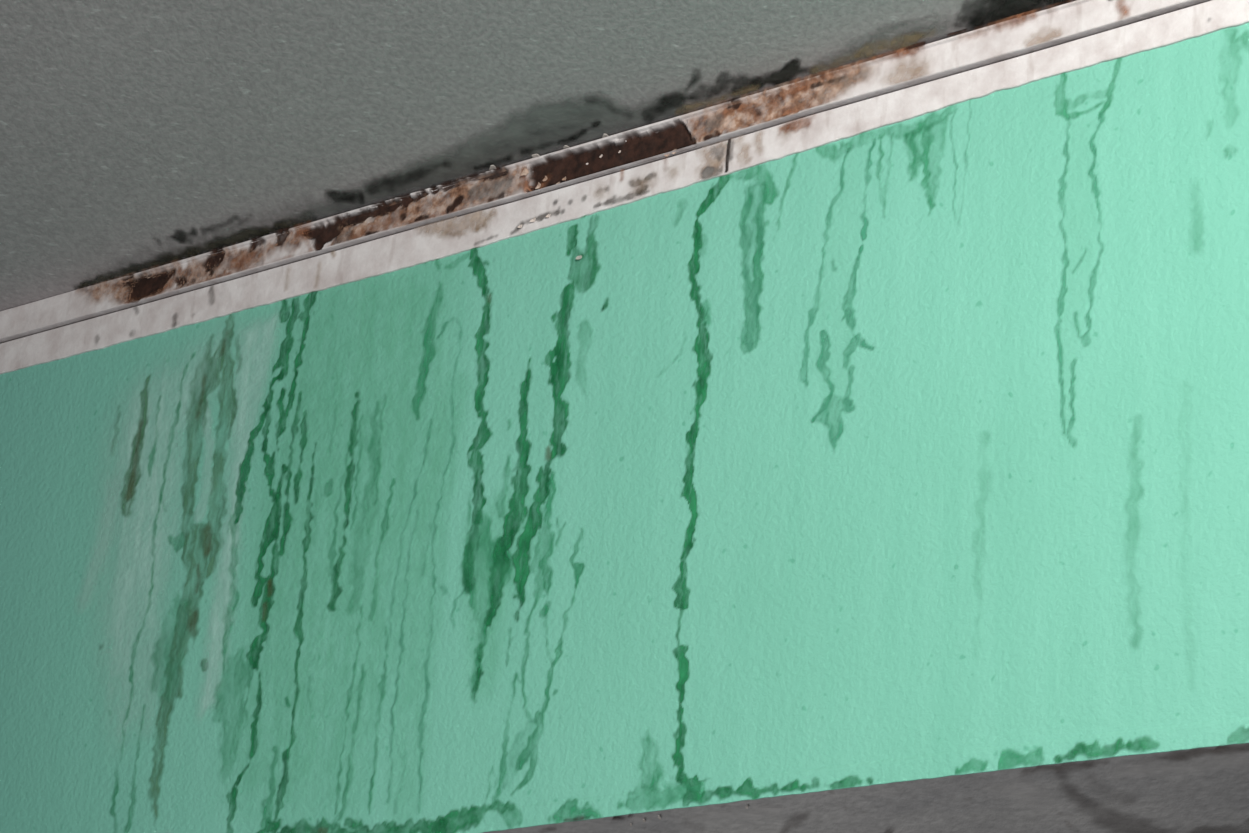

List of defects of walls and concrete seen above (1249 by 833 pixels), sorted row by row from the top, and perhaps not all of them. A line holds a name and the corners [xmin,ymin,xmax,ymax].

water stain [851,0,1069,58]
water stain [645,60,839,120]
corrosion [692,42,926,142]
corrosion [87,268,174,303]
water stain [77,212,316,288]
corrosion [332,167,524,245]
water stain [413,298,445,419]
water stain [468,248,491,524]
water stain [674,134,777,609]
water stain [486,284,574,626]
water stain [113,314,276,816]
water stain [672,633,689,782]